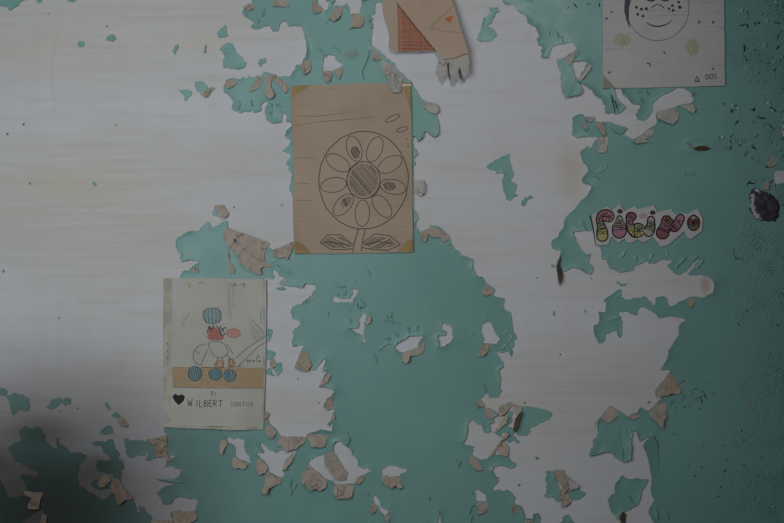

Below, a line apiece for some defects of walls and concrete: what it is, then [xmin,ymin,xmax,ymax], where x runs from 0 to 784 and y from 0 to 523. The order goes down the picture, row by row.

peeling [0,0,407,523]
peeling [312,0,714,523]
spalling [749,155,784,222]